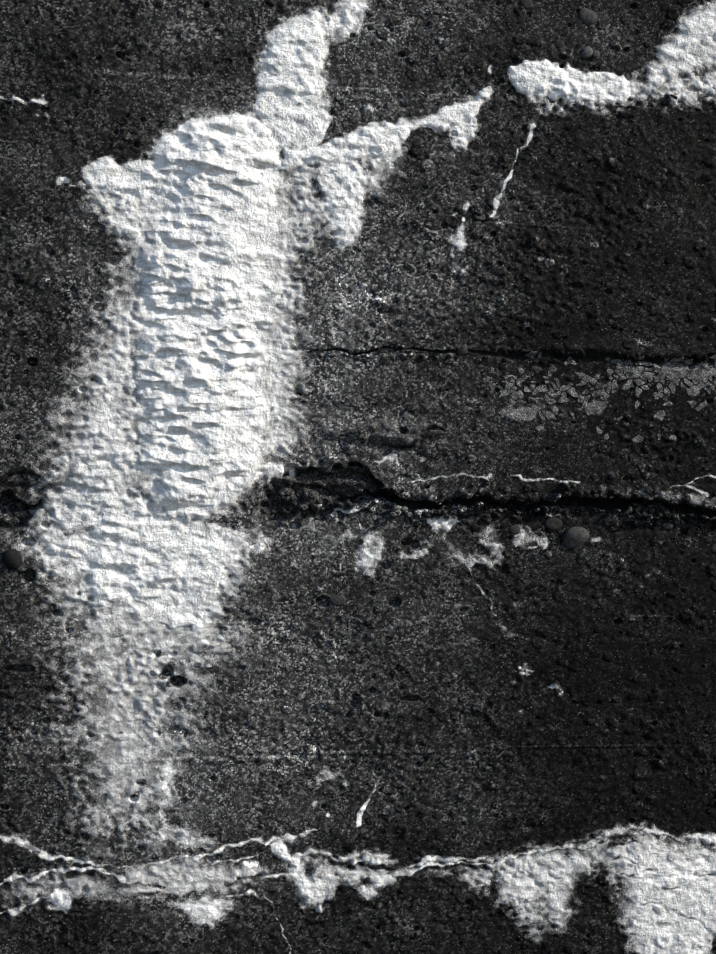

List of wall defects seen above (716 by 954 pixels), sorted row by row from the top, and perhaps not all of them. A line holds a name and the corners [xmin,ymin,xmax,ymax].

crack [293,345,715,367]
peeling [498,351,716,441]
crack [0,466,59,487]
crack [345,463,716,521]